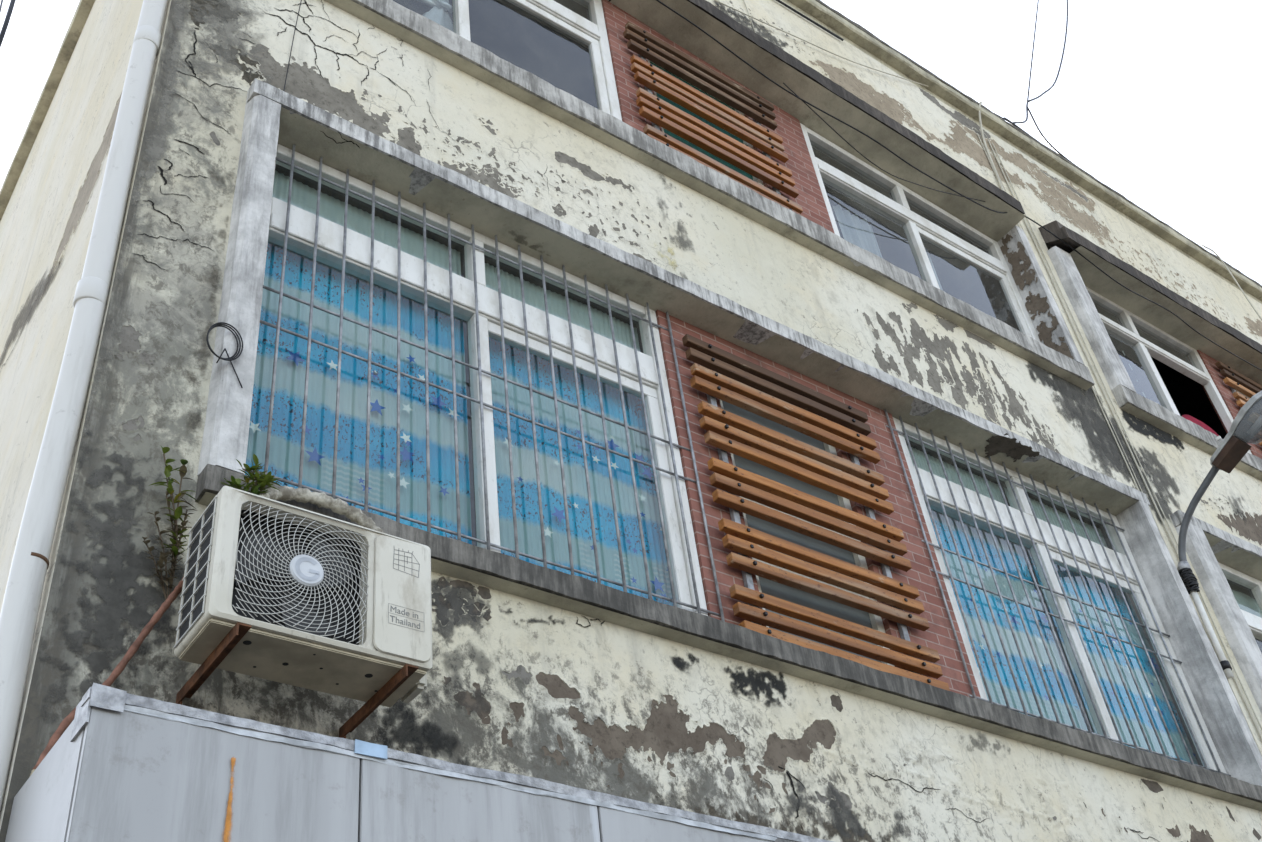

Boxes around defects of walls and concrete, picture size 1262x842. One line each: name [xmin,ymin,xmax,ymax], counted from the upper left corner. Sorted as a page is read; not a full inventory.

crack [132,31,247,271]
water stain [128,0,261,233]
crack [241,0,455,141]
peeling [186,0,668,263]
peeling [715,0,1262,340]
peeling [1000,234,1074,359]
peeling [855,301,1062,462]
peeling [1200,496,1262,547]
peeling [431,574,495,628]
peeling [441,663,844,817]
peeling [812,779,855,812]